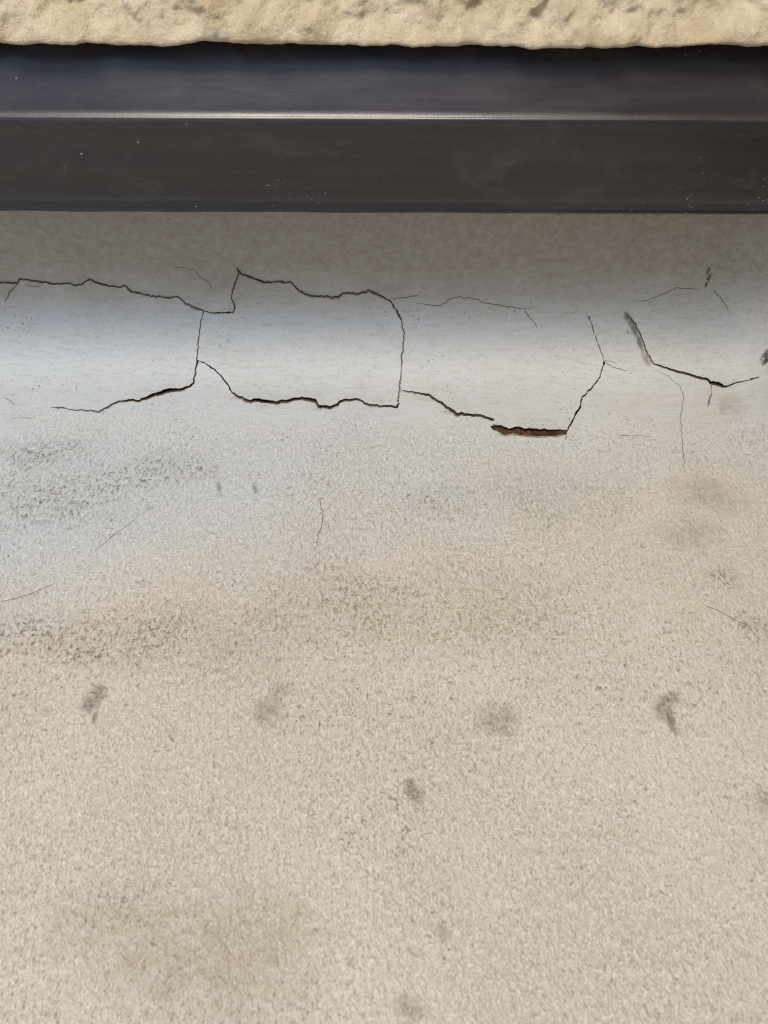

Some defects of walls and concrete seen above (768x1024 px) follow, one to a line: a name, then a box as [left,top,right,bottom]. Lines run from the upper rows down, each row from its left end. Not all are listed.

crack [0,267,536,421]
crack [565,287,759,467]